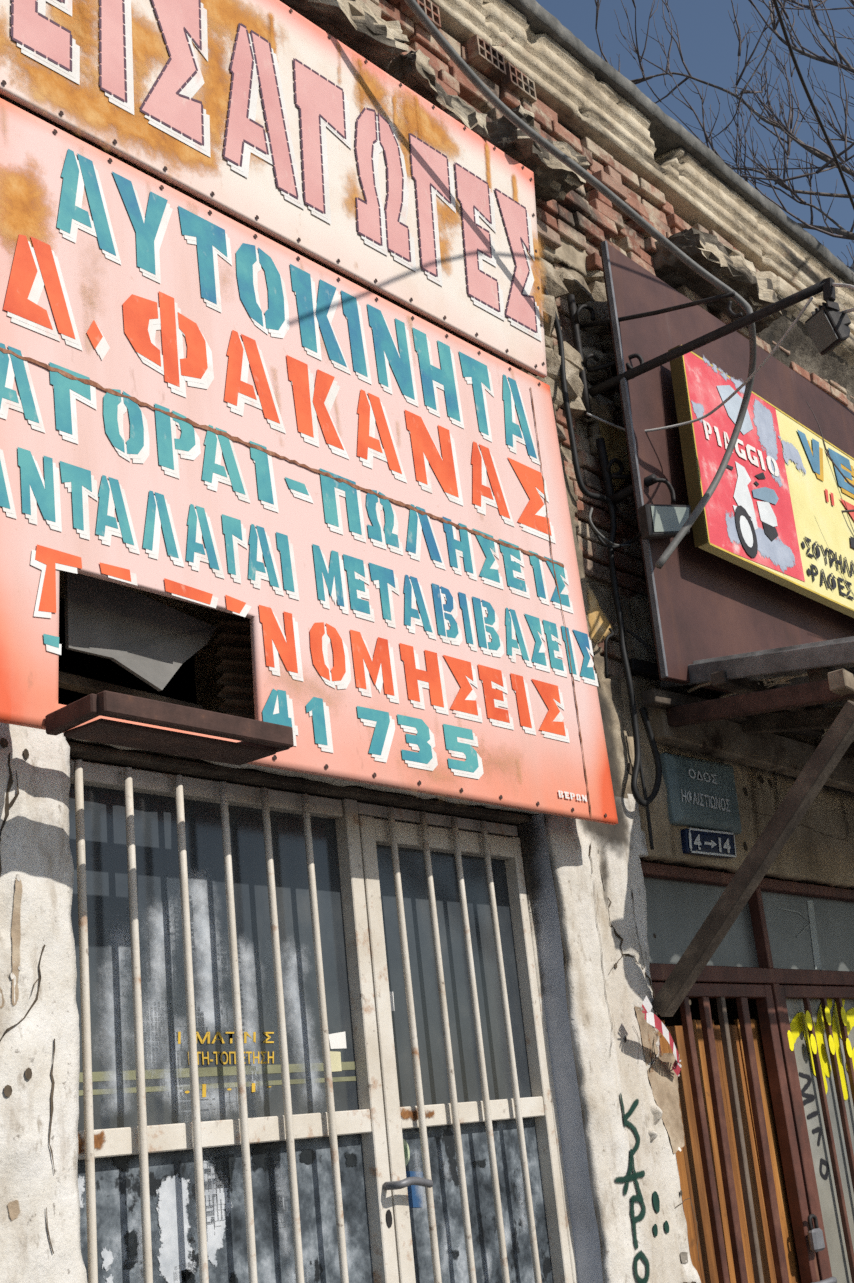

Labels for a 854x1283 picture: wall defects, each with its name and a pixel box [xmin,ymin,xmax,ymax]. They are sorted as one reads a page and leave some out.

crack [0,753,19,876]
crack [0,945,45,1042]
crack [589,843,656,1073]
crack [48,1039,56,1174]
crack [46,1207,54,1254]